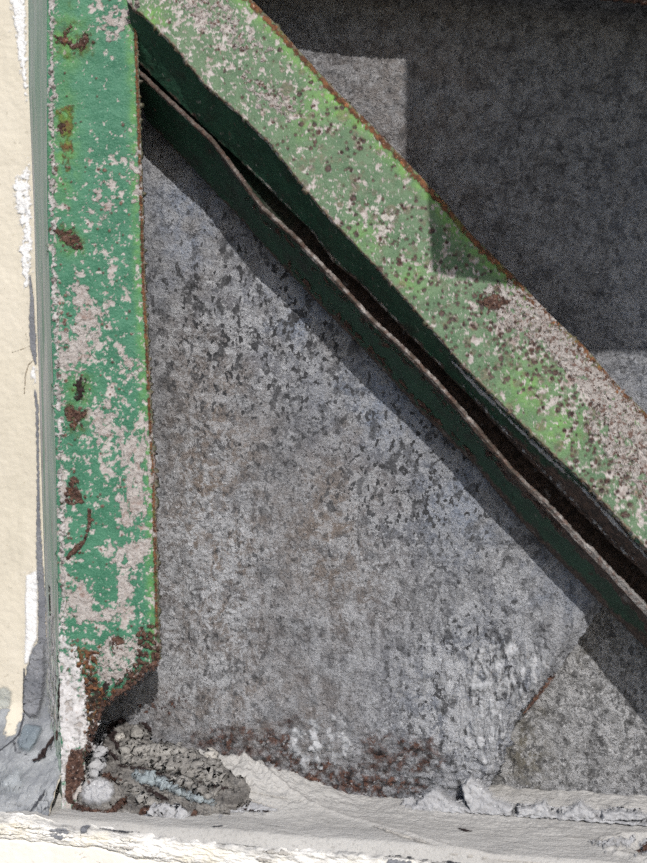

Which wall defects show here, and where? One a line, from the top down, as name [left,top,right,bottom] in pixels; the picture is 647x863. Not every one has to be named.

rust [56,105,73,171]
rust [49,225,83,250]
rust [54,24,95,56]
rust [249,0,647,420]
rust [60,28,160,813]
spalling [0,0,446,863]
peeling [482,279,647,511]
rust [359,736,447,773]